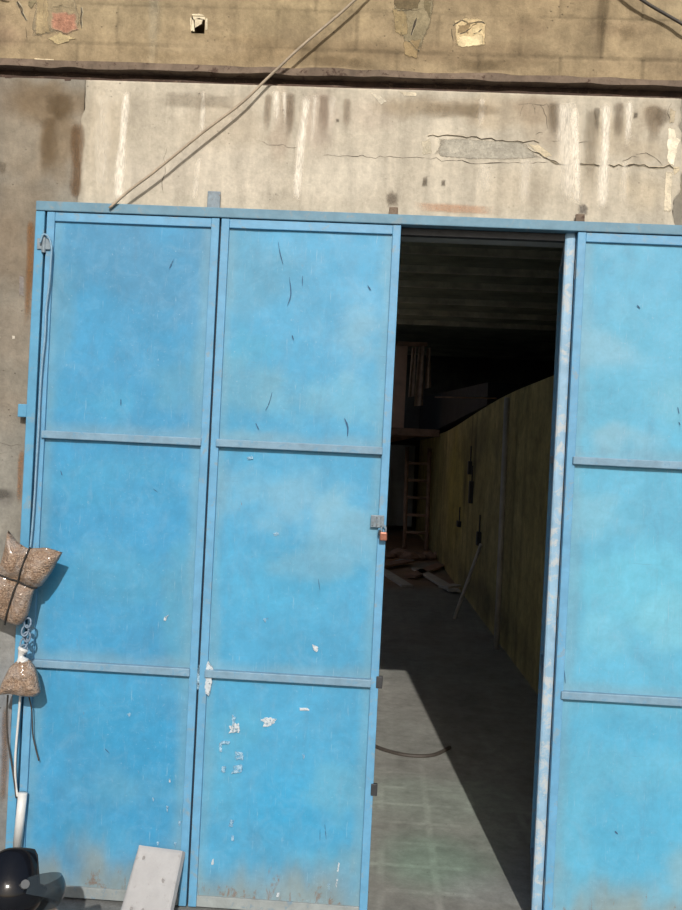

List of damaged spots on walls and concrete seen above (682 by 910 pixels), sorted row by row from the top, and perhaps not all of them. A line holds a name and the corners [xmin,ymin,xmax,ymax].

crack [0,0,27,38]
flaking render [28,0,79,44]
peeling [394,0,431,17]
spalling [451,17,487,47]
damp [295,100,309,194]
crack [333,103,680,170]
damp [552,106,579,198]
damp [599,103,631,204]
spalling [664,108,681,212]